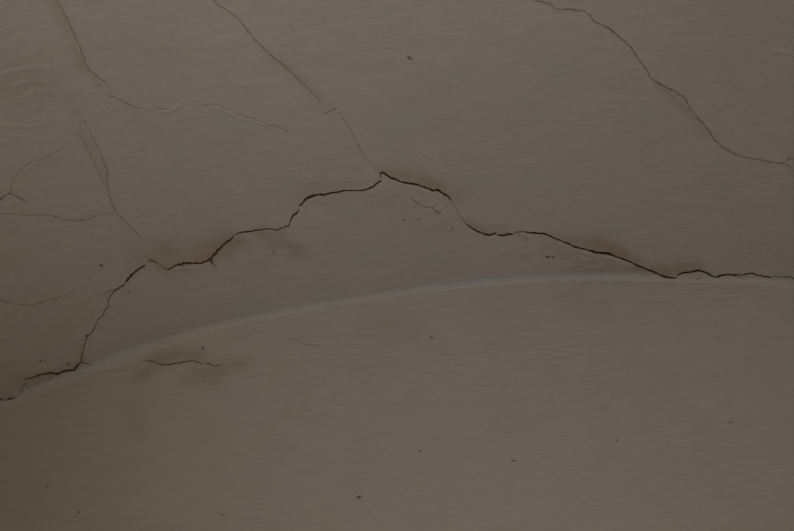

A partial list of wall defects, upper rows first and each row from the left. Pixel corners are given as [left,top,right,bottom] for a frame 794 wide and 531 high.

crack [56,0,287,131]
crack [213,0,320,101]
crack [534,0,794,171]
crack [0,113,794,401]